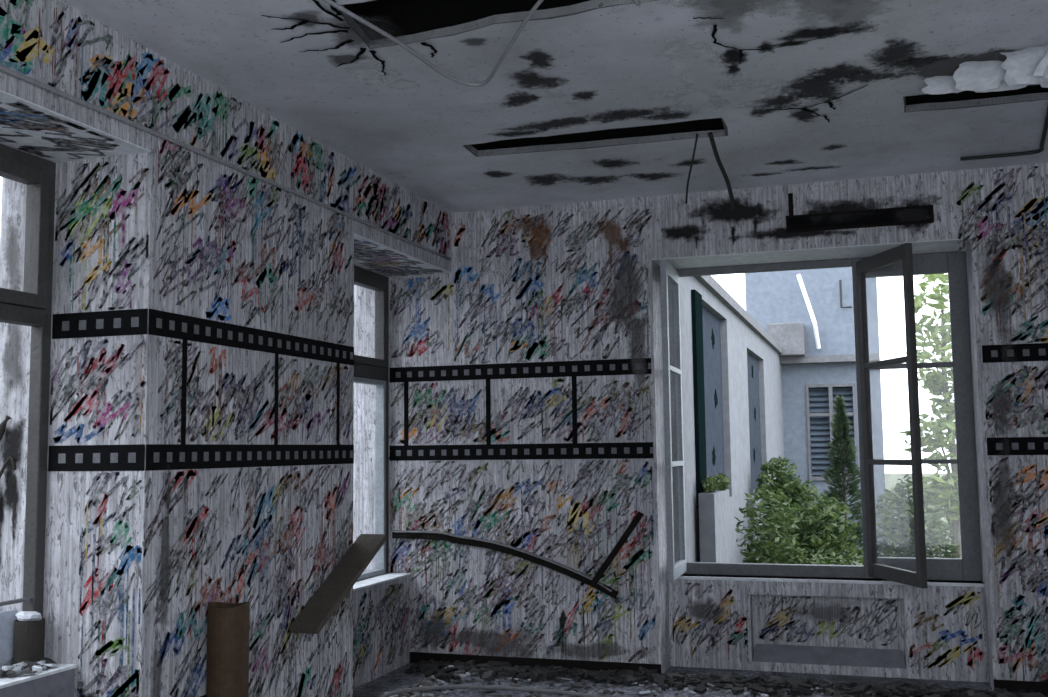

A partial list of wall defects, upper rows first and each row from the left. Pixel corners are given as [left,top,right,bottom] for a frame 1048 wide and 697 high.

leakage [495,38,948,137]
peeling [880,45,1048,94]
leakage [0,485,17,563]